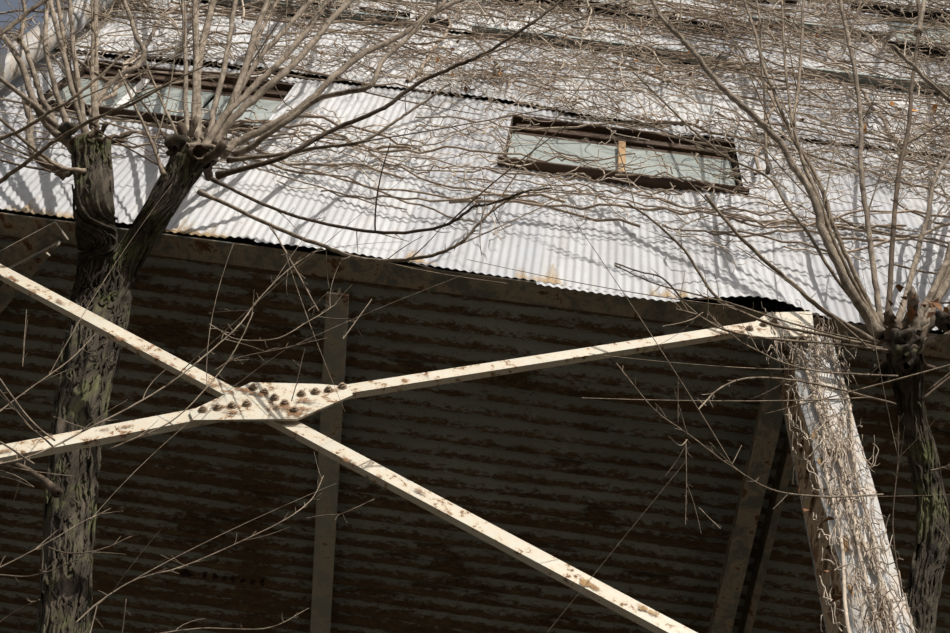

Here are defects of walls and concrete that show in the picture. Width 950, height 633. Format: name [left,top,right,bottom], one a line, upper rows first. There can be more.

rust [15,205,74,219]
rust [117,306,223,367]
rust [382,351,434,374]
rust [186,373,338,416]
rust [433,370,623,434]
rust [930,428,950,479]
rust [513,534,594,563]
rust [349,542,600,615]